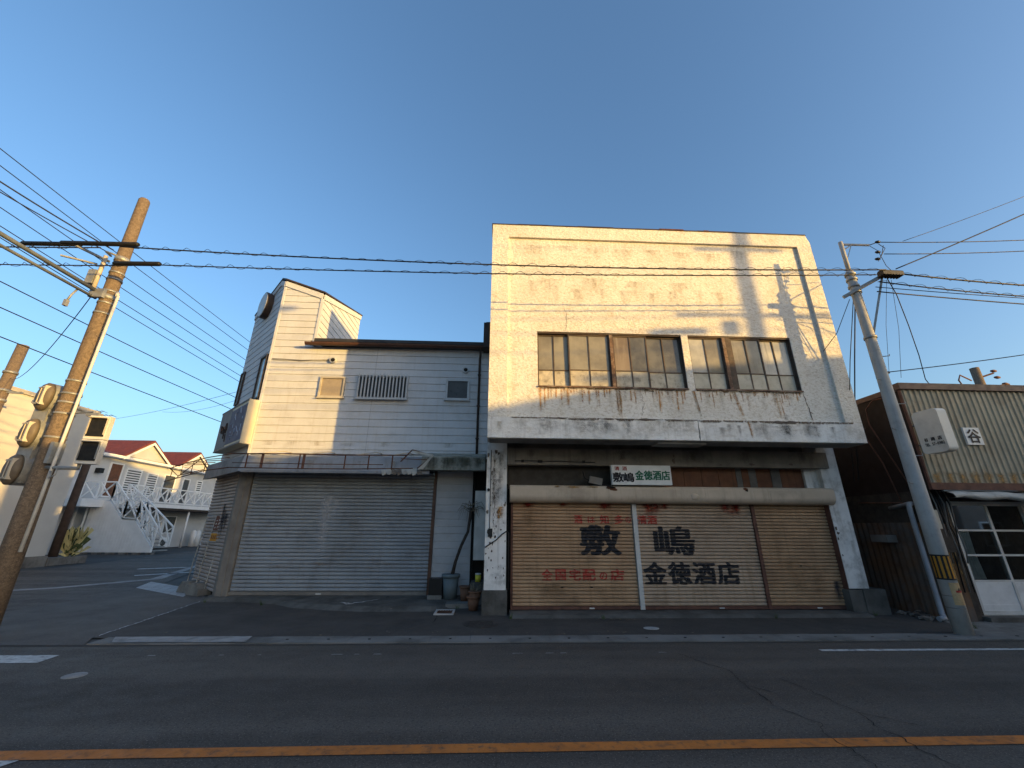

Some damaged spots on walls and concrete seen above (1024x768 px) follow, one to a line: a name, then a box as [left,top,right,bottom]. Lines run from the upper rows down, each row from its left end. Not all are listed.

rust [539,388,661,412]
rust [676,390,800,413]